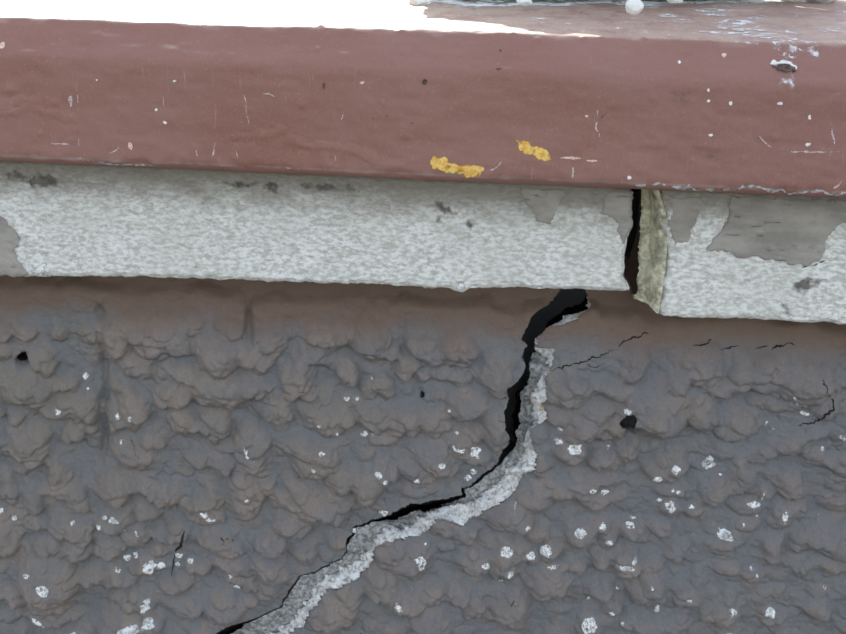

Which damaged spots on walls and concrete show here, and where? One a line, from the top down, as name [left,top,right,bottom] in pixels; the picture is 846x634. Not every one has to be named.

peeling [521,188,566,224]
crack [626,189,667,313]
peeling [601,176,846,266]
crack [226,290,649,634]
crack [171,531,185,576]